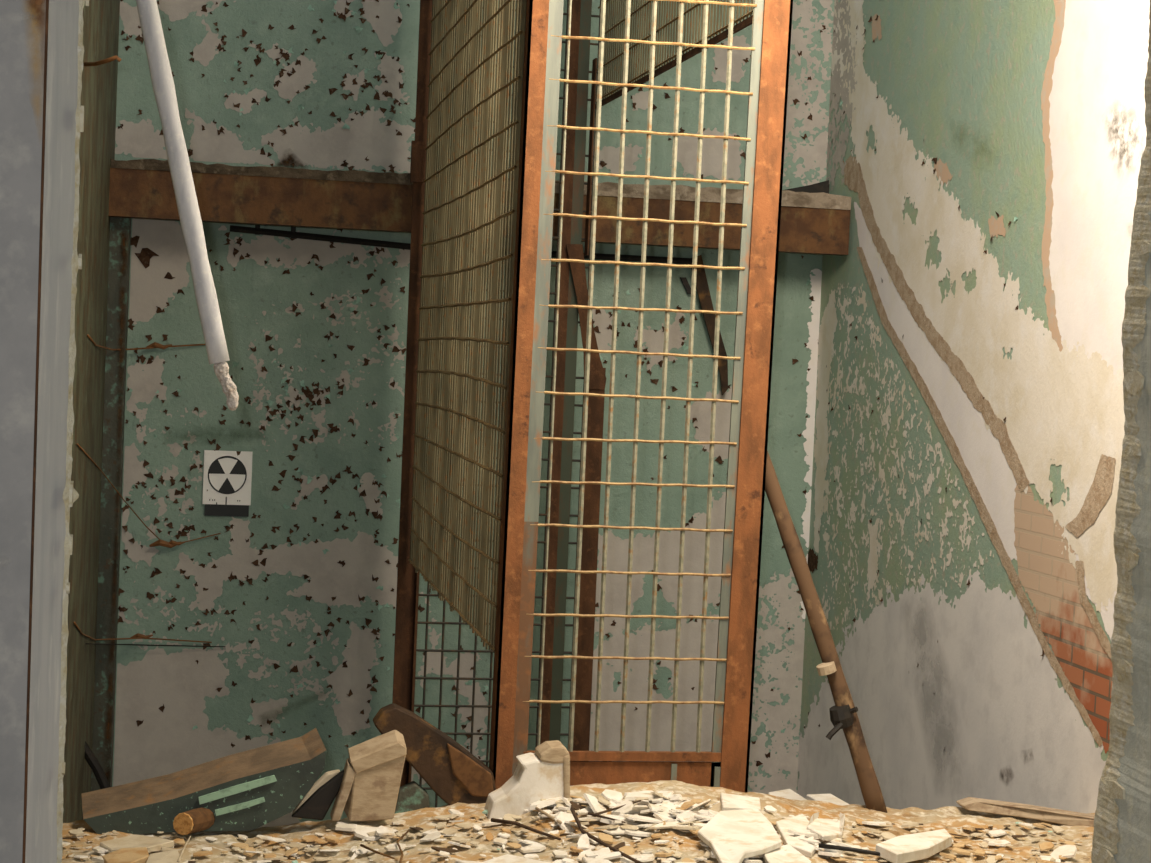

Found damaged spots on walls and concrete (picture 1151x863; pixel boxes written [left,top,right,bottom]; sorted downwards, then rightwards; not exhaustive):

peeling [120,0,144,51]
peeling [115,109,168,159]
peeling [157,0,416,173]
peeling [113,218,410,787]
peeling [782,0,1151,863]
peeling [416,589,491,760]
peeling [748,569,865,805]